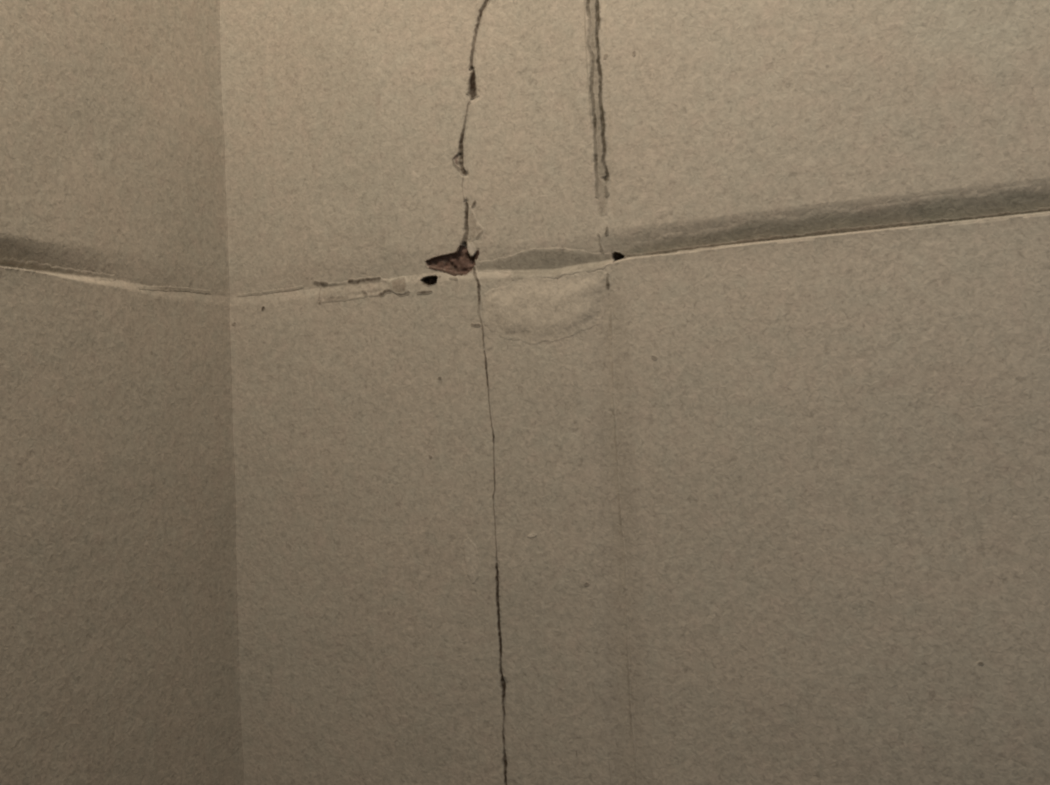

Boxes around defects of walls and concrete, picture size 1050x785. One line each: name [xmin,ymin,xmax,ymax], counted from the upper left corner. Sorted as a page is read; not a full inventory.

crack [583,0,610,198]
flaking render [313,241,479,305]
crack [451,0,509,785]